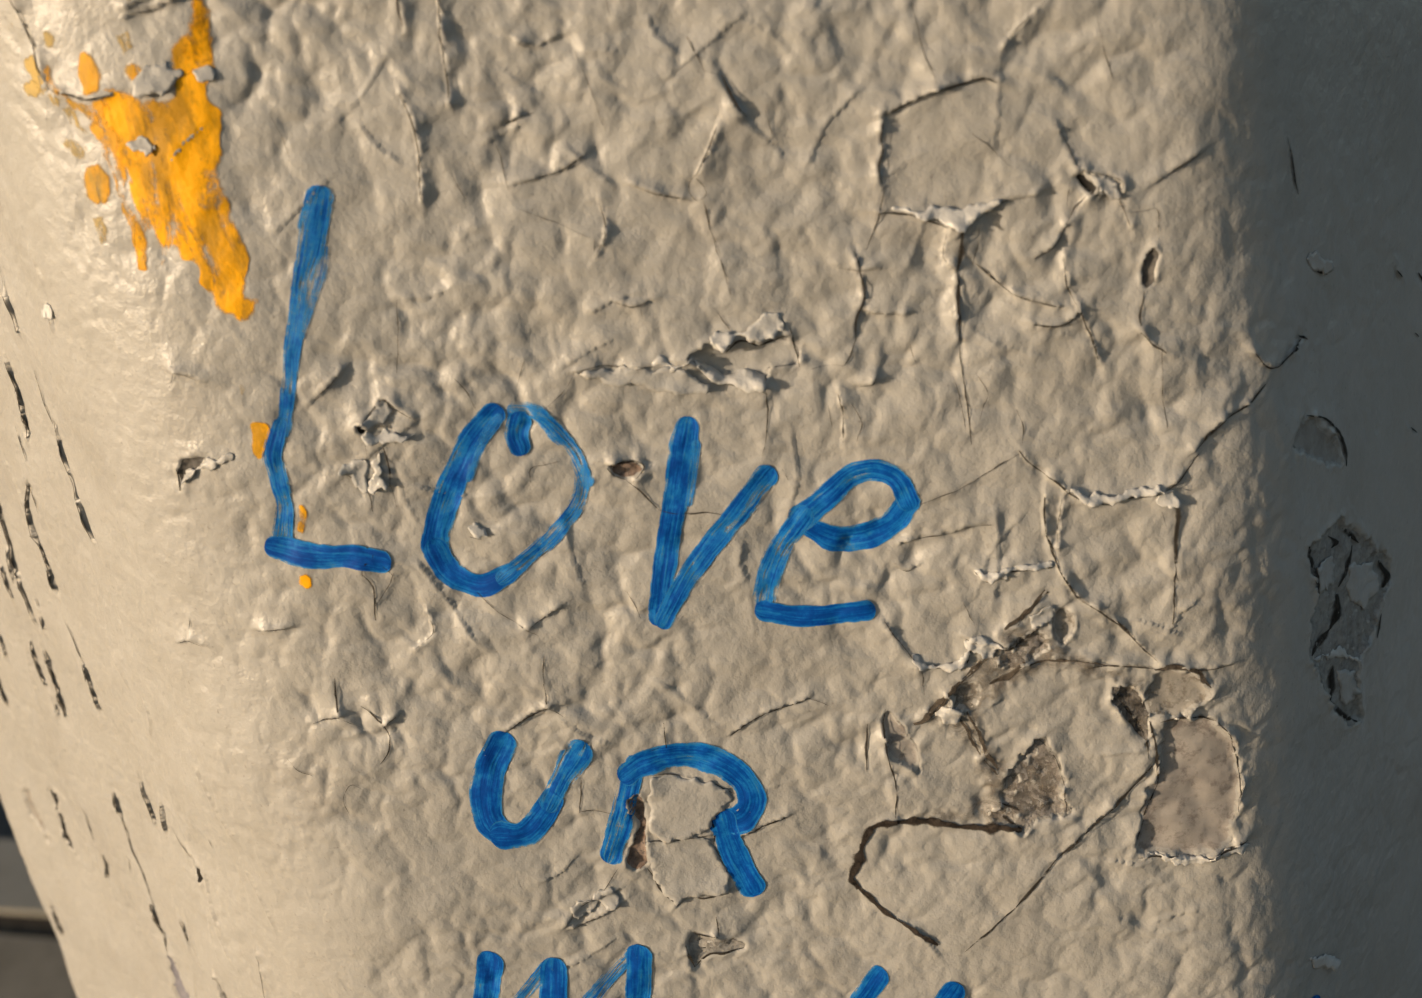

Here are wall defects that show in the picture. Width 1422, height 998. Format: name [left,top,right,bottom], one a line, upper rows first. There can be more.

crack [10,0,113,120]
crack [643,37,773,294]
crack [0,272,98,717]
peeling [338,399,416,512]
crack [607,460,722,515]
peeling [552,308,800,437]
crack [813,2,1307,775]
peeling [865,709,919,818]
peeling [934,683,1072,833]
peeling [964,605,1250,866]
peeling [570,774,734,924]
crack [965,766,1152,952]